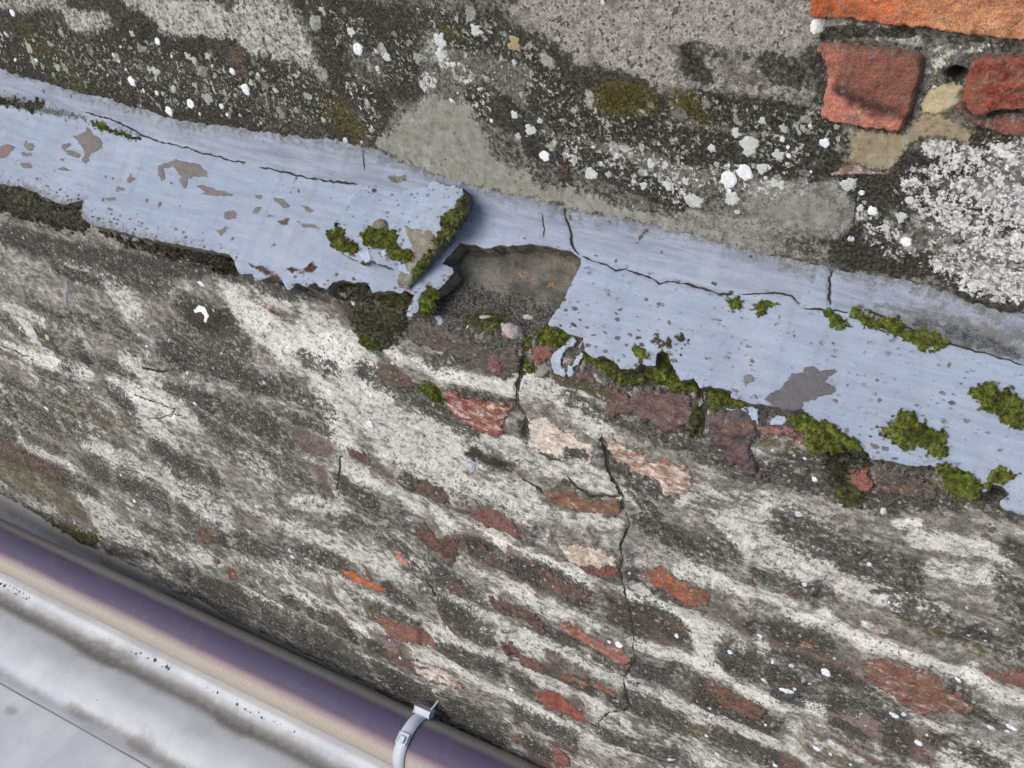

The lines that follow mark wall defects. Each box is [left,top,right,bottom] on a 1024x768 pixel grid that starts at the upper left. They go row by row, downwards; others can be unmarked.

crack [85,112,364,185]
spalling [0,184,83,208]
spalling [89,223,232,258]
crack [542,160,911,330]
crack [515,336,529,437]
spalling [240,183,836,481]
crack [949,343,1022,365]
spalling [981,484,1024,518]
crack [566,434,635,737]